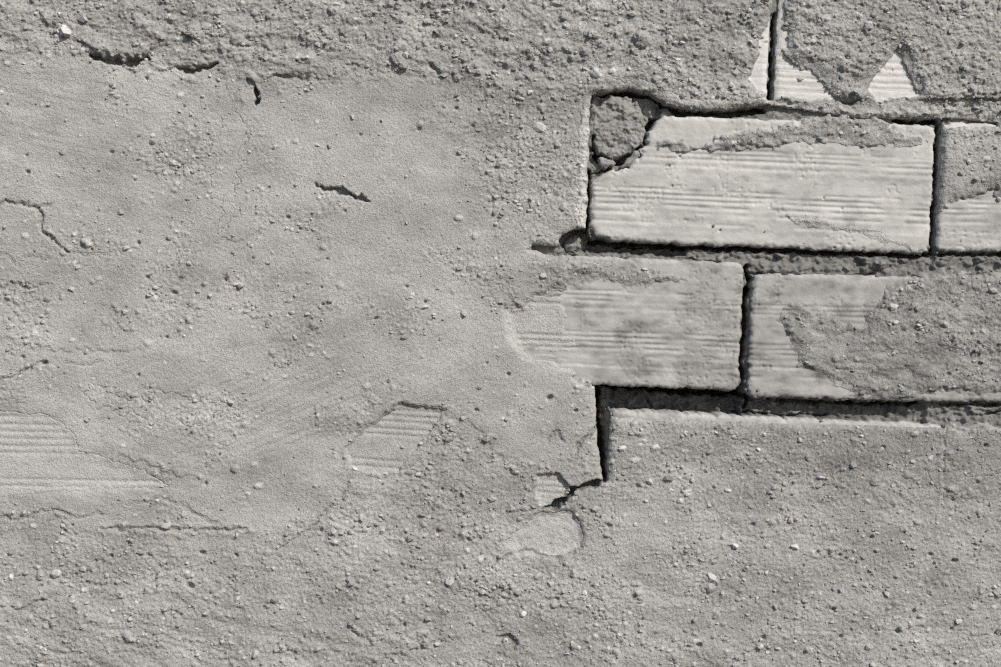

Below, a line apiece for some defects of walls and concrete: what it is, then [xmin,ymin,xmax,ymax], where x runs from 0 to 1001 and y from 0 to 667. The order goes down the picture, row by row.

spalling [574,0,834,229]
spalling [867,50,920,103]
spalling [504,291,578,369]
crack [541,384,611,511]